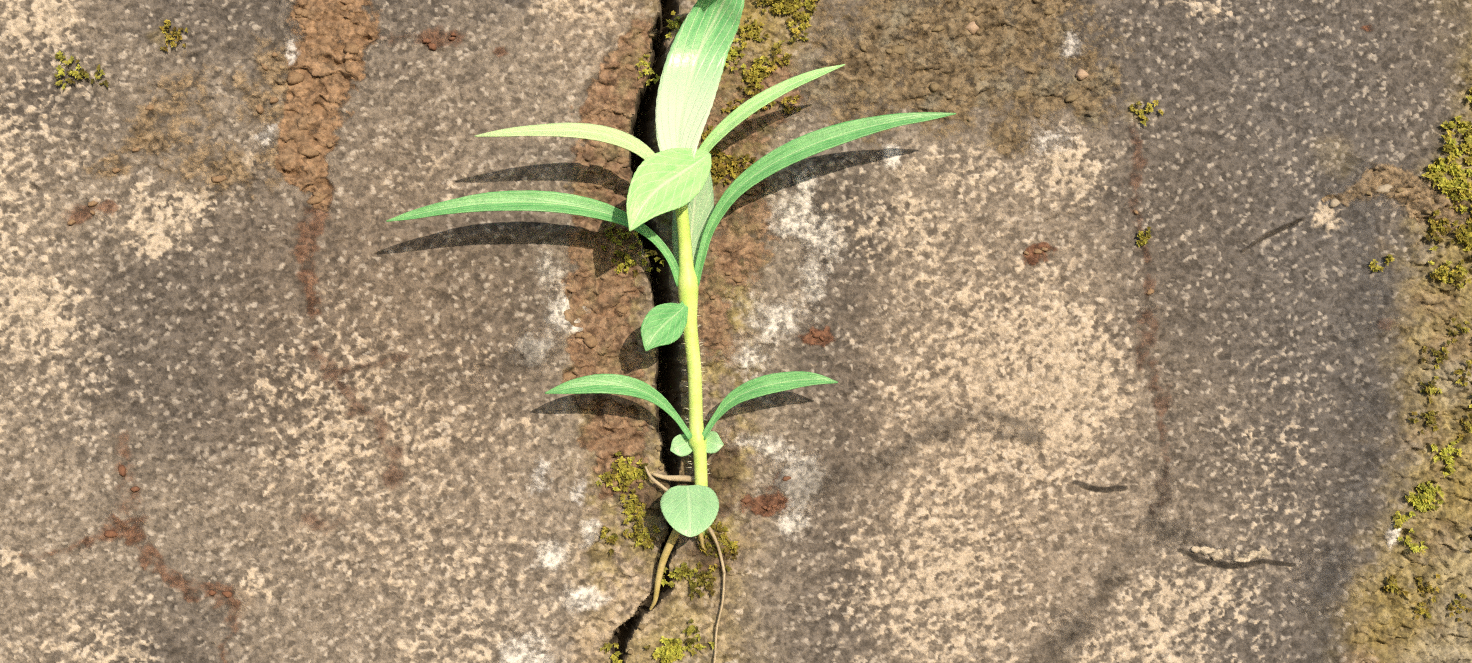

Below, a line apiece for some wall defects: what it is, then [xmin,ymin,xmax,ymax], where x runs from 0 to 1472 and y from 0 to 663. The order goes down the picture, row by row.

crack [627,0,681,183]
rust [295,195,332,316]
crack [635,218,673,307]
rust [311,347,408,488]
rust [69,515,240,628]
crack [609,338,688,663]
damp [1387,527,1401,546]